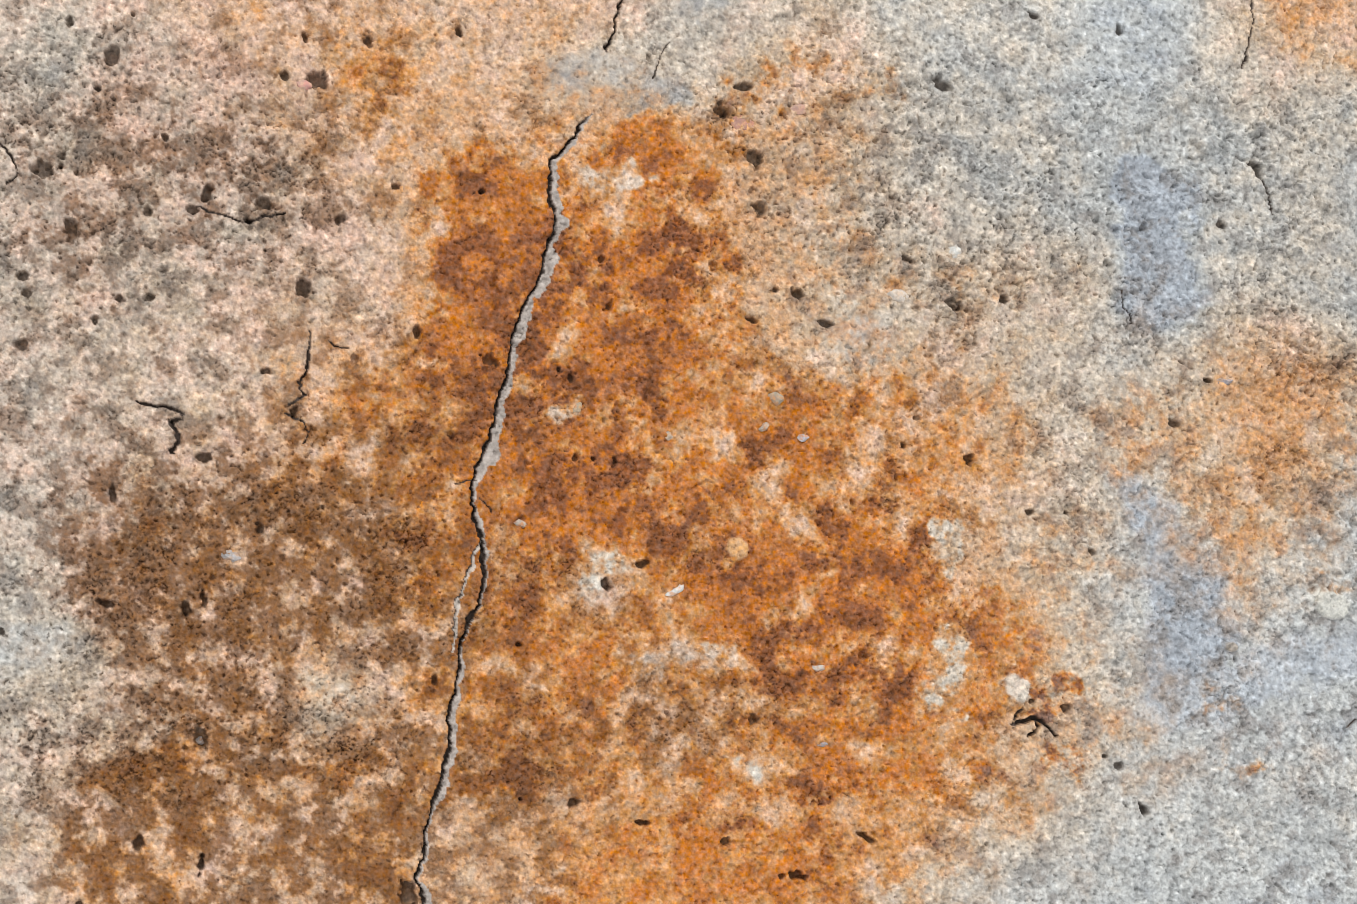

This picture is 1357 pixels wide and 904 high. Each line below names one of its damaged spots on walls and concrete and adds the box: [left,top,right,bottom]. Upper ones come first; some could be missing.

rust [142,0,295,27]
rust [307,12,442,173]
rust [452,0,571,86]
crack [603,0,623,53]
rust [710,0,947,137]
crack [414,114,594,904]
rust [0,78,1132,904]
rust [962,275,1357,649]
rust [1186,649,1283,794]